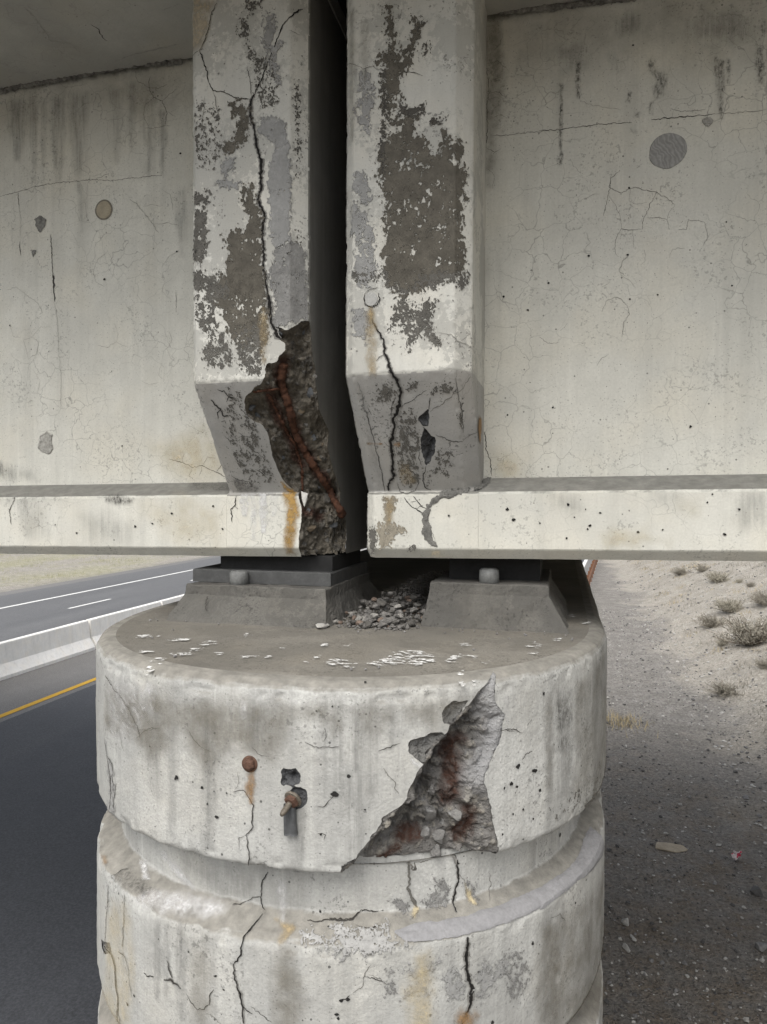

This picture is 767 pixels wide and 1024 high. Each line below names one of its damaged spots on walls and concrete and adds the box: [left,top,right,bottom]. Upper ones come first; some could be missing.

crack [192,3,303,339]
spalling [192,0,347,556]
peeling [350,4,471,354]
crack [581,172,708,334]
corrosion [281,482,299,552]
spalling [374,378,456,490]
crack [359,288,492,547]
crack [104,772,271,1024]
spalling [341,673,505,872]
crack [462,937,476,1015]